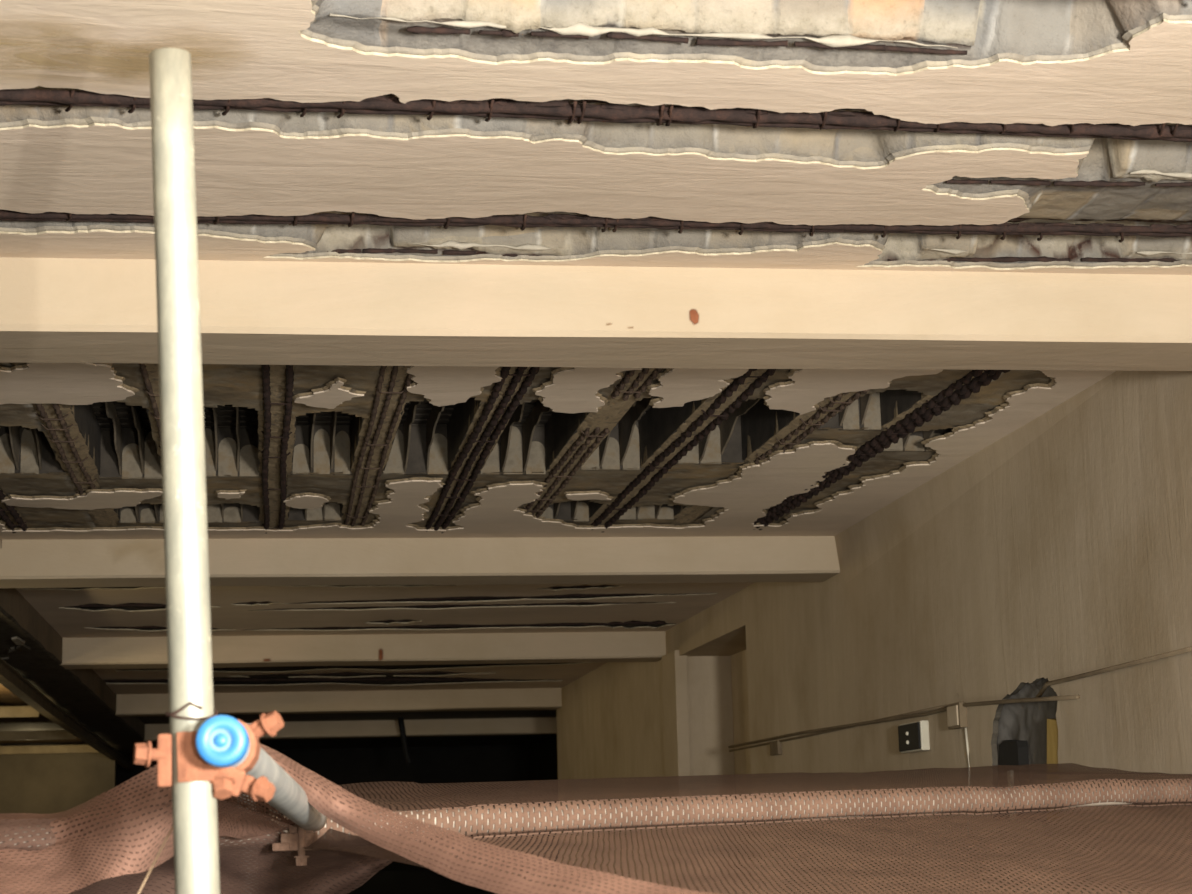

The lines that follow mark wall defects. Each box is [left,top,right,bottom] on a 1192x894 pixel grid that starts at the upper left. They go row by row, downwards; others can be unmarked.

spalling [300,0,1192,73]
rust [0,87,151,113]
spalling [0,105,151,128]
rust [193,95,1192,142]
spalling [193,109,1192,268]
rust [0,209,154,223]
spalling [0,220,154,233]
rust [197,212,1192,243]
rust [690,309,699,324]
spalling [0,404,164,533]
spalling [207,365,801,534]
spalling [669,370,1056,530]